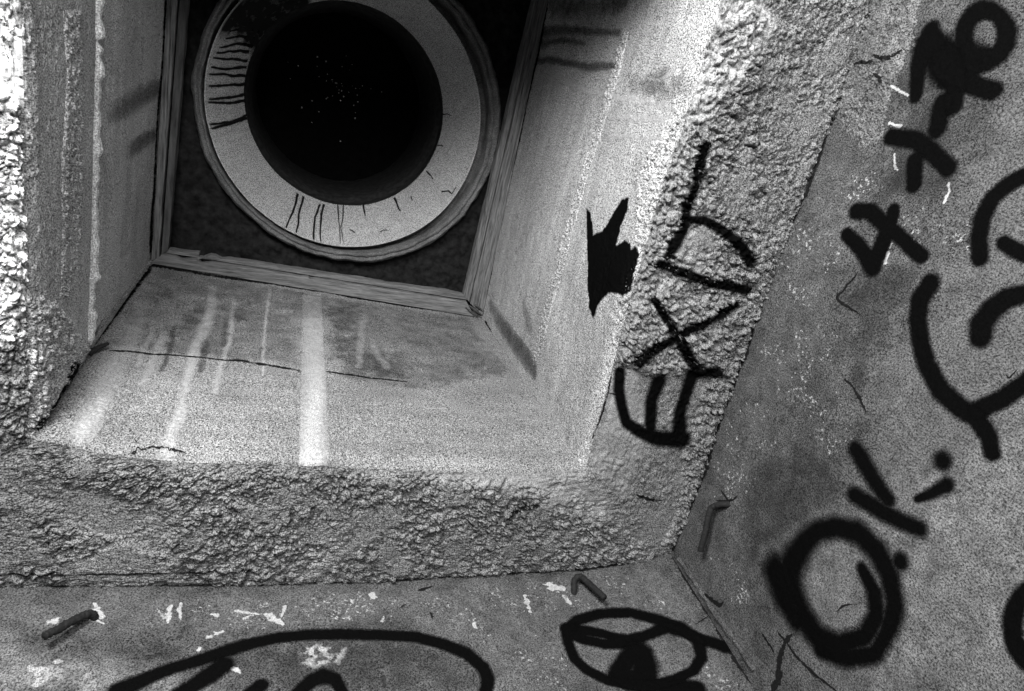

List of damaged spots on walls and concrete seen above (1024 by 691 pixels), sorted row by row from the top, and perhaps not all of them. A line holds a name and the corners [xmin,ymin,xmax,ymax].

crack [509,3,548,186]
crack [854,50,902,83]
crack [32,0,513,431]
crack [836,273,860,314]
damp [78,382,109,437]
crack [128,439,186,454]
damp [159,299,215,460]
damp [300,320,325,467]